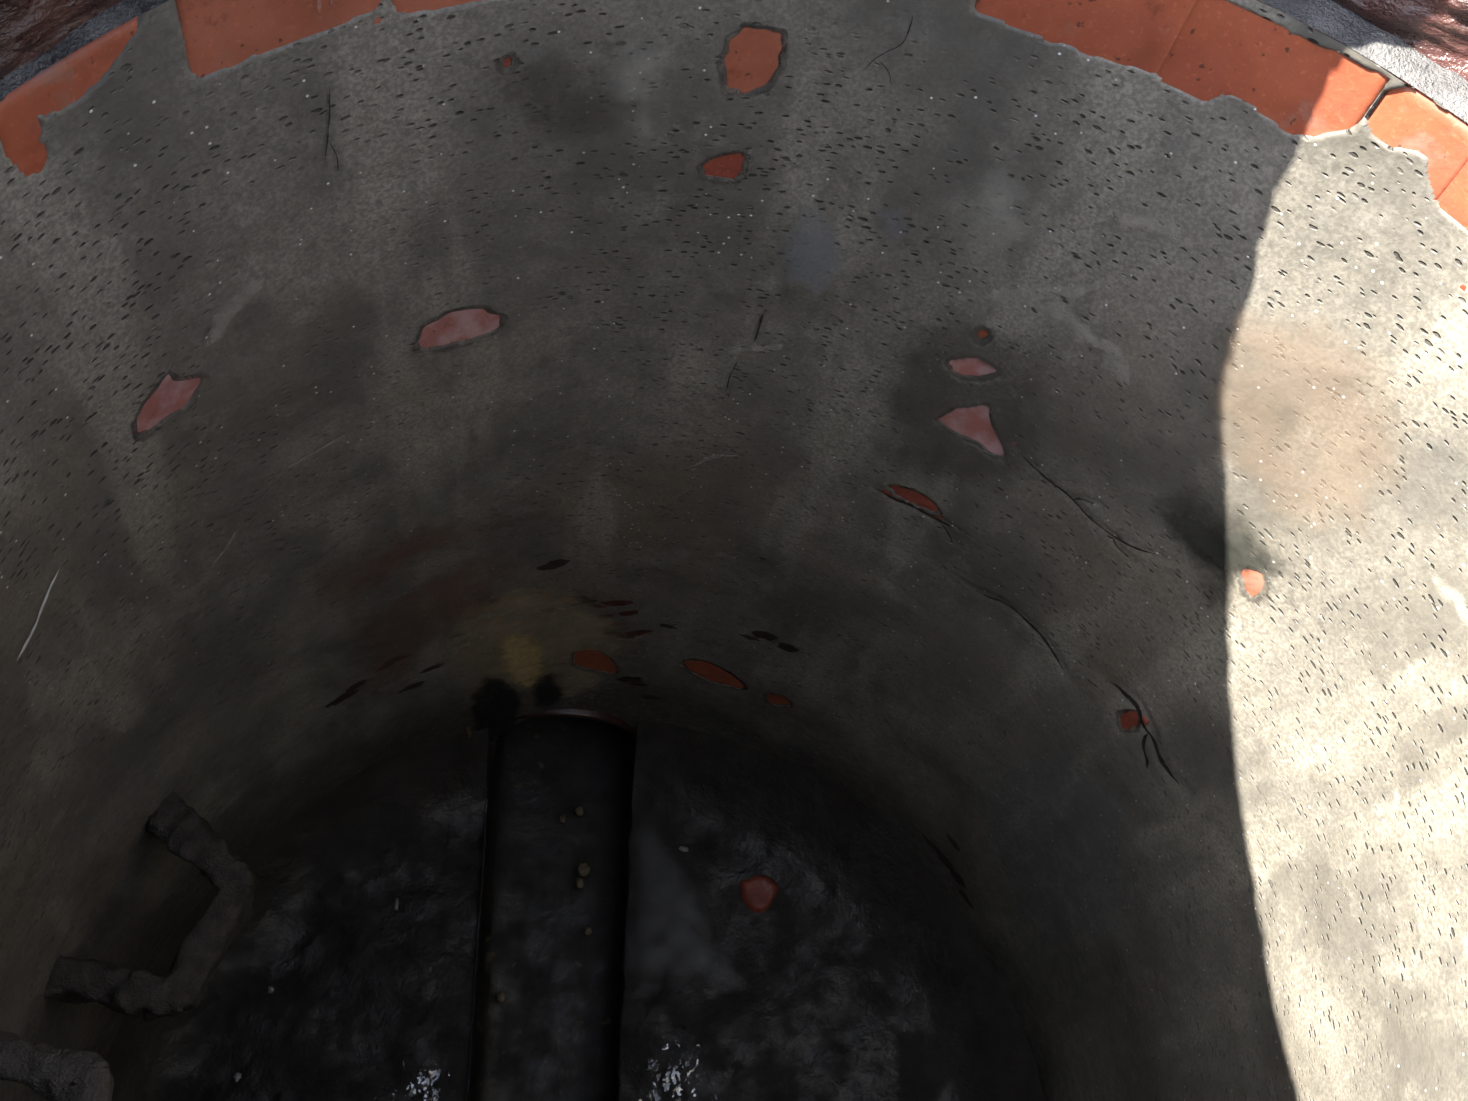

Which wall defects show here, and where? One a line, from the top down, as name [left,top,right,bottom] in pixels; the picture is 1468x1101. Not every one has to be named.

spalling [717,23,788,98]
spalling [697,152,750,184]
spalling [412,306,507,353]
spalling [945,326,1000,382]
spalling [131,372,208,442]
spalling [934,403,1017,462]
crack [871,486,953,543]
crack [1022,455,1157,558]
leakage [1167,507,1273,581]
spalling [1235,565,1269,602]
crack [981,593,1063,669]
crack [1110,682,1180,785]